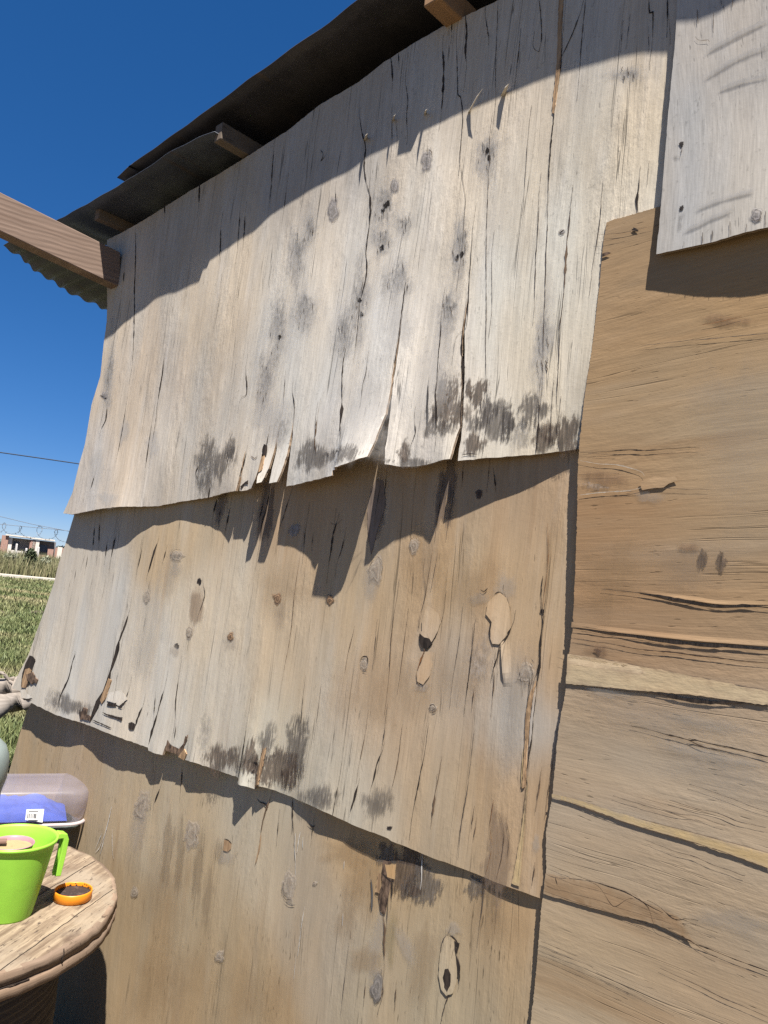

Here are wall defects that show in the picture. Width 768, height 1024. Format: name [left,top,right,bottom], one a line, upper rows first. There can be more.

water stain [197,437,235,488]
crack [255,0,585,864]
water stain [426,378,578,456]
water stain [205,717,308,790]